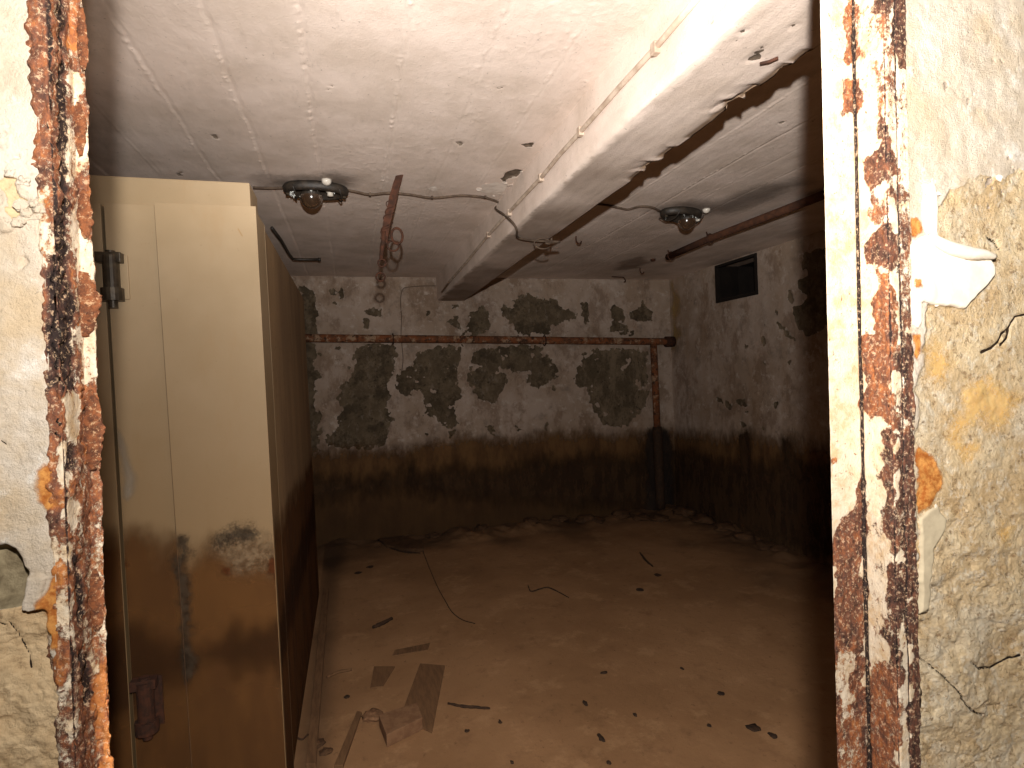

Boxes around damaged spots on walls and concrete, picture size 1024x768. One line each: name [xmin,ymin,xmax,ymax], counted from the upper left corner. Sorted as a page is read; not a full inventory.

rust [76,190,94,238]
rust [77,271,102,337]
spalling [298,286,590,453]
spalling [573,300,653,428]
crack [980,314,1024,354]
rust [83,389,106,471]
spalling [911,156,1024,768]
rust [88,568,105,631]
water stain [103,430,833,768]
spalling [0,544,59,768]
crack [917,639,982,716]
crack [972,653,1021,670]